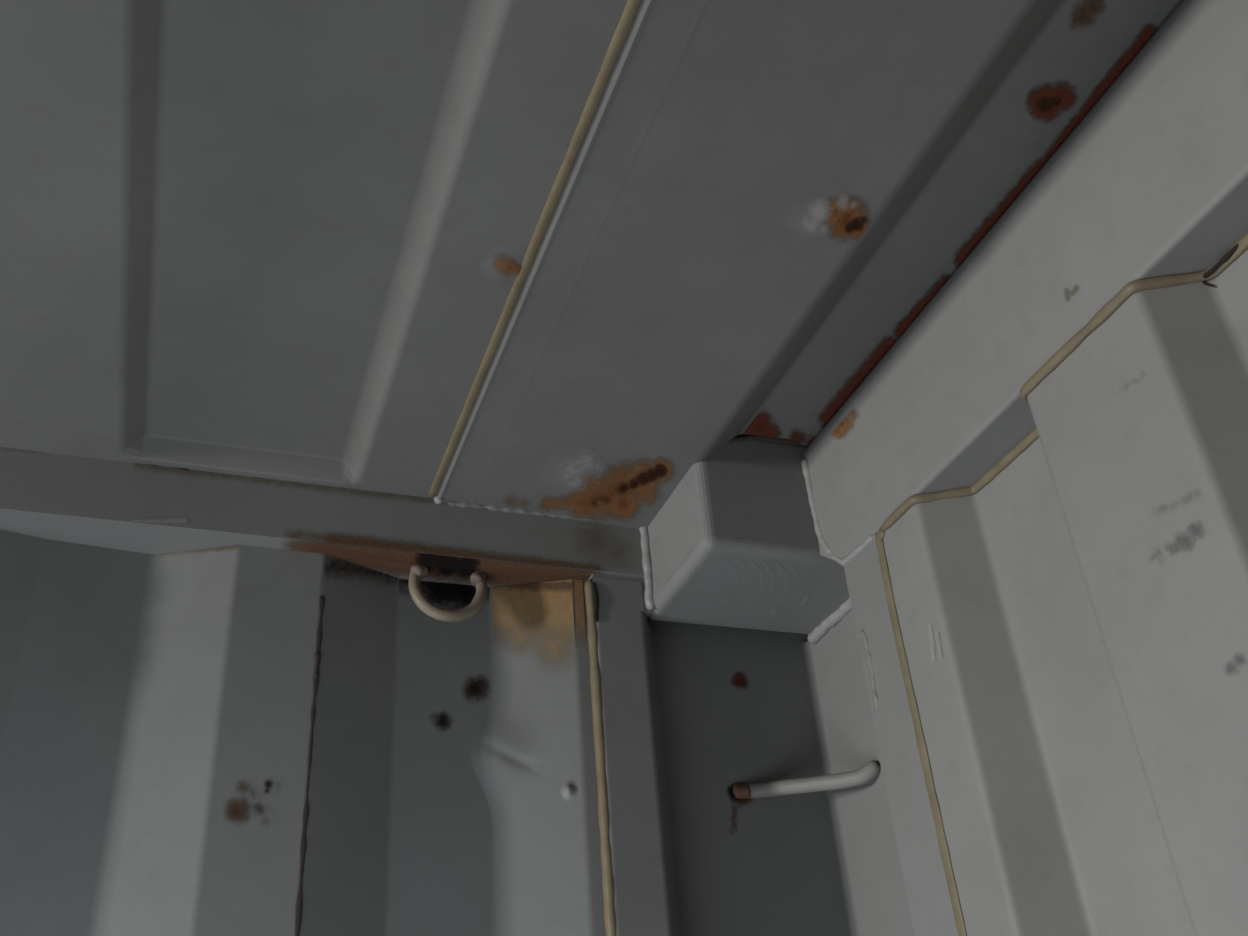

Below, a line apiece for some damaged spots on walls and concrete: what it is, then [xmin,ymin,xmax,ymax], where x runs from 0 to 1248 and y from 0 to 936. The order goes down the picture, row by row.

rust [1073,0,1103,28]
rust [809,197,870,240]
rust [820,25,1156,439]
rust [744,413,813,445]
rust [541,458,674,520]
rust [288,532,600,662]
rust [465,679,488,697]
rust [436,713,450,730]
rust [728,785,752,826]